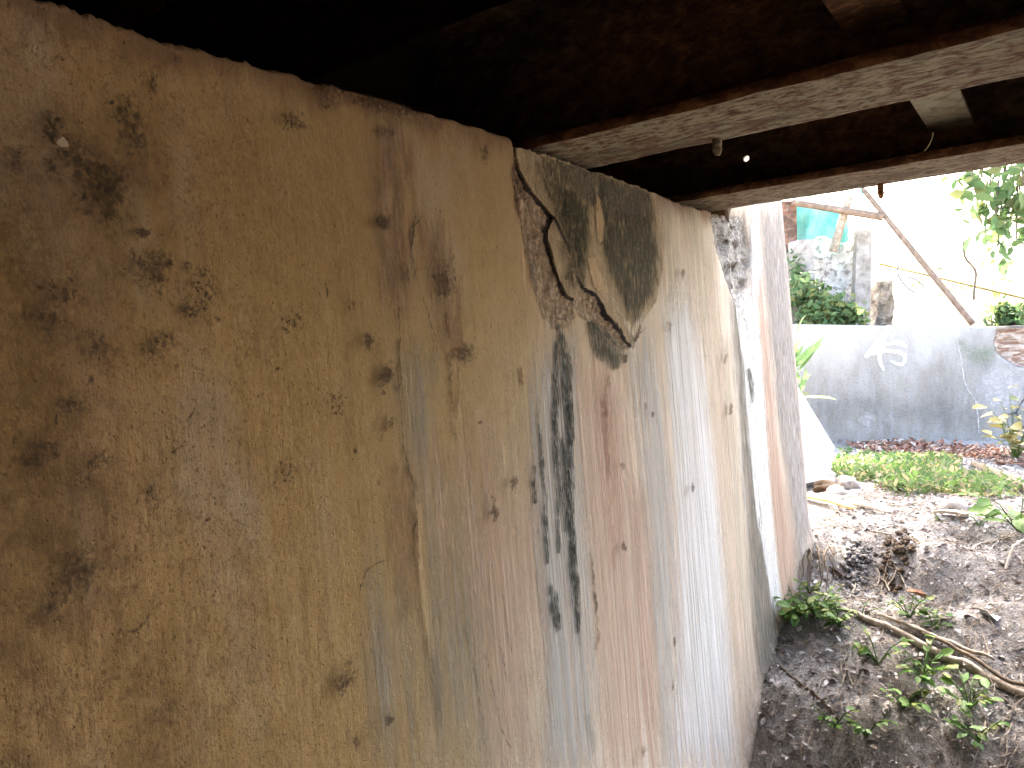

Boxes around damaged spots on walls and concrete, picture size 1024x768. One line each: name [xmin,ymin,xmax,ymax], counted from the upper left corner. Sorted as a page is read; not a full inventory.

leakage [43,117,124,222]
leakage [124,251,216,317]
crack [514,159,642,348]
flaking render [513,148,664,351]
leakage [465,211,754,768]
peeling [710,216,782,622]